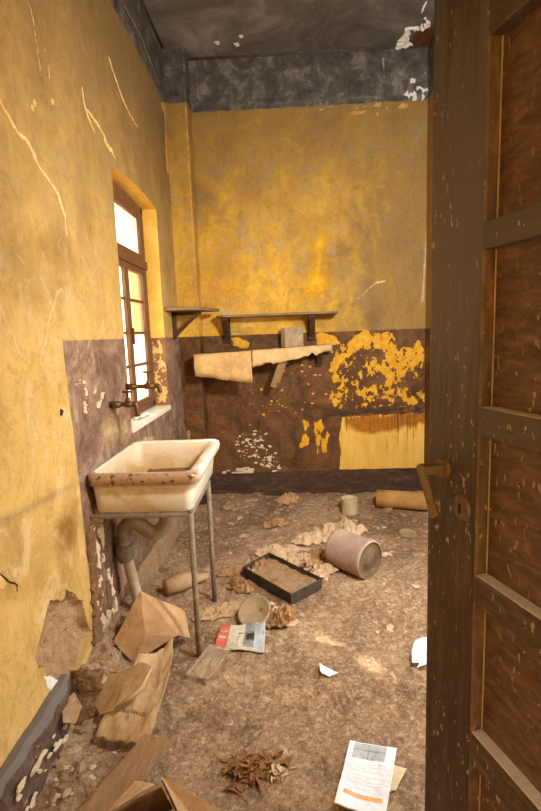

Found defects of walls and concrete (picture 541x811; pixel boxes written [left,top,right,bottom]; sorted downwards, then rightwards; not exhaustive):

crack [28,2,50,79]
peeling [395,17,434,50]
crack [82,87,115,158]
crack [108,57,138,127]
peeling [398,78,428,109]
crack [0,99,68,235]
peeling [152,338,168,403]
peeling [284,329,425,415]
peeling [222,424,281,474]
peeling [299,419,330,454]
spalling [36,513,121,691]
peeling [15,724,68,811]